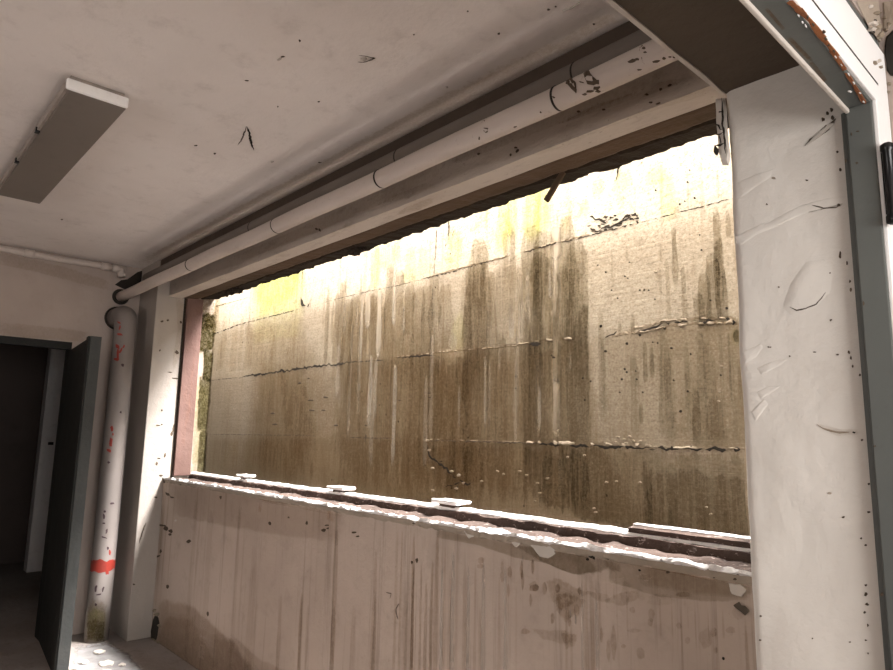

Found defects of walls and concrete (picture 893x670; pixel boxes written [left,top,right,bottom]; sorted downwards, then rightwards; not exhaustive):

rust [787,0,866,104]
crack [238,128,254,150]
crack [804,108,836,147]
spalling [588,213,639,232]
spalling [600,307,737,345]
crack [211,337,575,381]
crack [425,435,745,492]